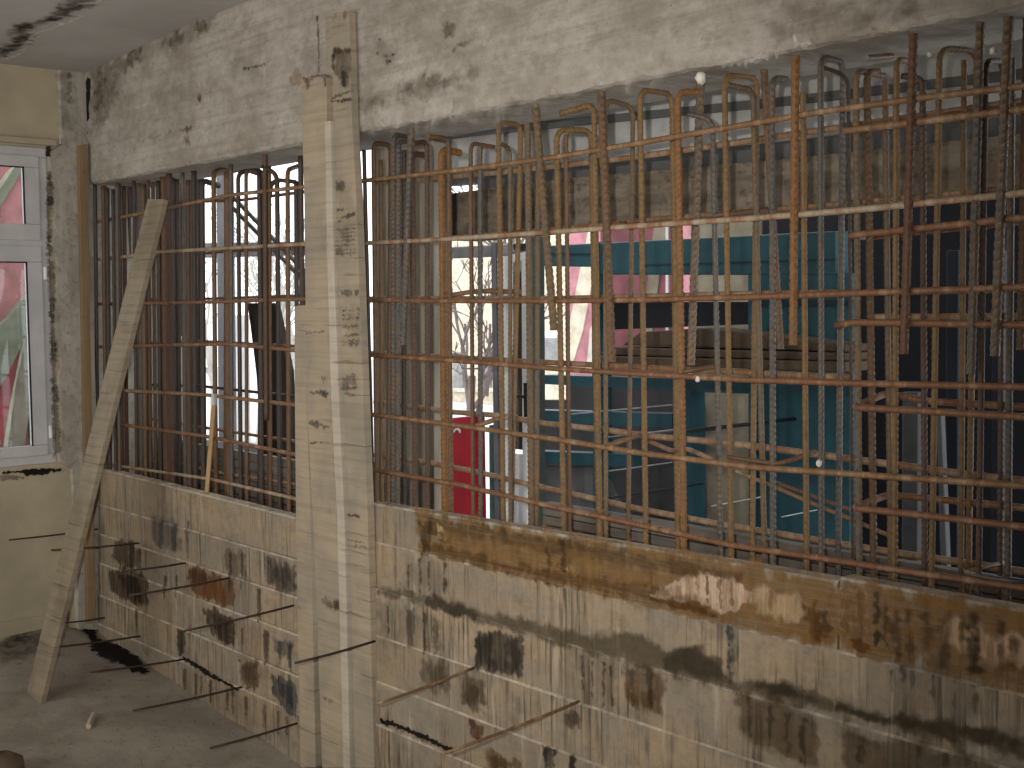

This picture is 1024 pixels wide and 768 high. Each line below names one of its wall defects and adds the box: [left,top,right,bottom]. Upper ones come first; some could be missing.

damp [109,540,148,631]
rust [187,566,235,607]
damp [203,606,243,648]
damp [257,557,297,667]
damp [378,506,1024,768]
peeling [650,572,808,624]
damp [263,675,297,734]